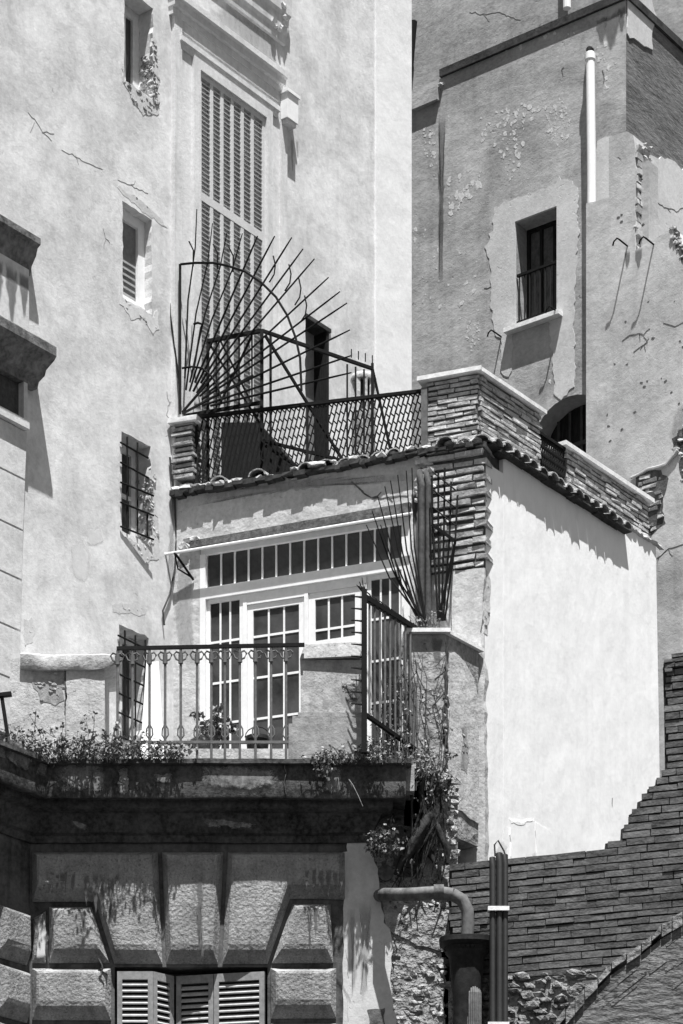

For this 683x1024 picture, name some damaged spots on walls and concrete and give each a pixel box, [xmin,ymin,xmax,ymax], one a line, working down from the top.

spalling [122,33,160,115]
crack [28,112,146,193]
spalling [617,142,653,249]
corrosion [625,250,641,267]
crack [622,322,683,352]
spalling [124,463,160,565]
spalling [636,425,683,535]
spalling [31,670,65,705]
water stain [58,765,103,790]
water stain [119,769,129,793]
water stain [204,766,272,790]
water stain [196,884,204,954]